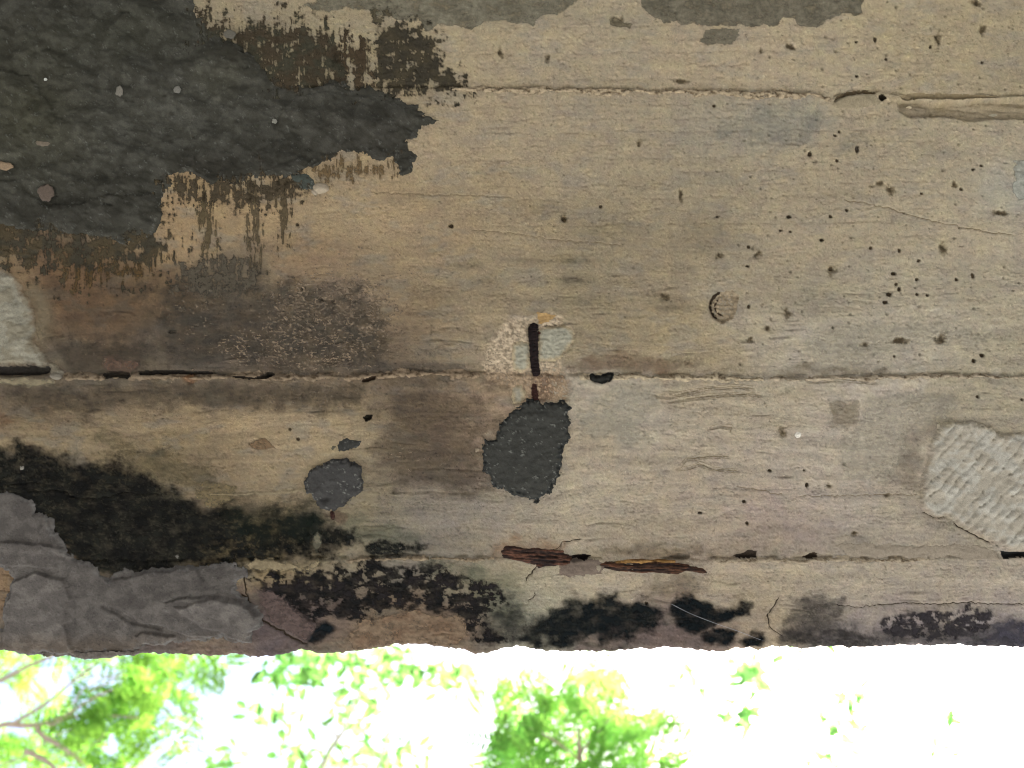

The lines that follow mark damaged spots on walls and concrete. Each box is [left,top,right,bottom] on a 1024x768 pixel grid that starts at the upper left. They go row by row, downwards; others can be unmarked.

spalling [477,310,577,407]
peeling [196,481,237,508]
peeling [247,533,321,571]
water stain [0,439,765,648]
peeling [257,590,316,642]
water stain [780,598,1024,648]
spalling [67,650,140,660]